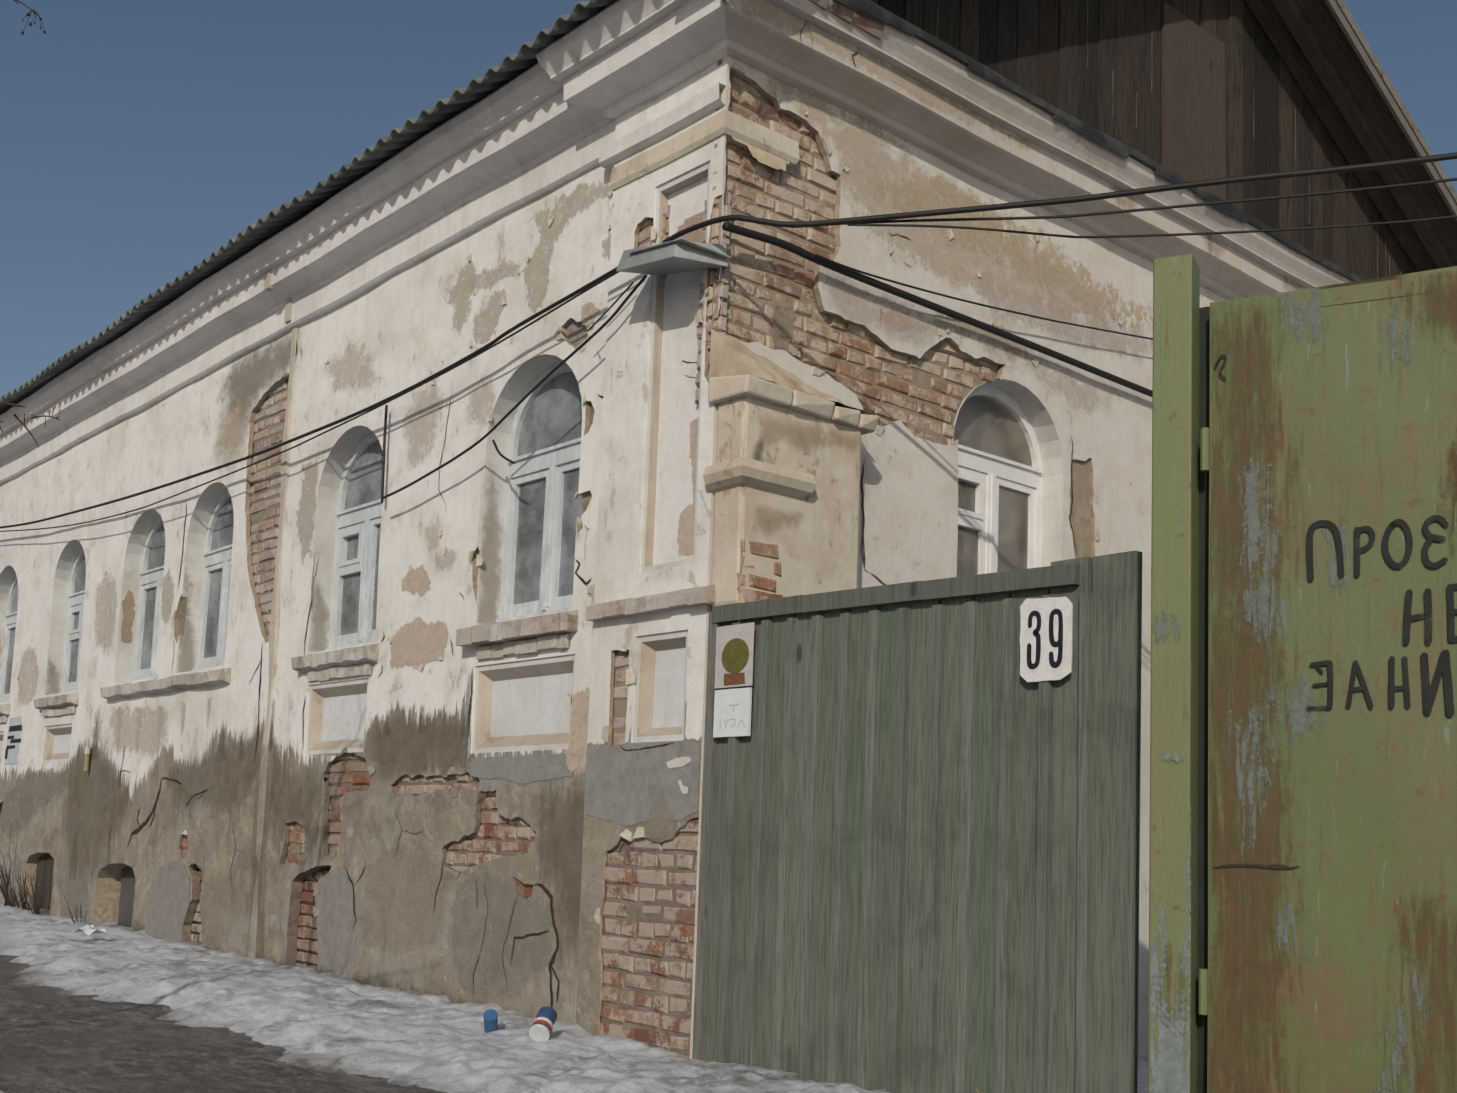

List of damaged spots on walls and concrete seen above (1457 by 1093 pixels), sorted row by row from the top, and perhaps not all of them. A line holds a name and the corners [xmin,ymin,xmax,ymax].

peeling [743,0,1030,147]
spalling [638,59,1153,558]
spalling [248,378,318,640]
spalling [737,538,783,622]
crack [860,461,886,585]
damp [111,703,186,753]
crack [119,746,208,848]
spalling [277,747,375,968]
spalling [394,767,537,878]
crack [432,861,559,1007]
spalling [594,817,699,1059]